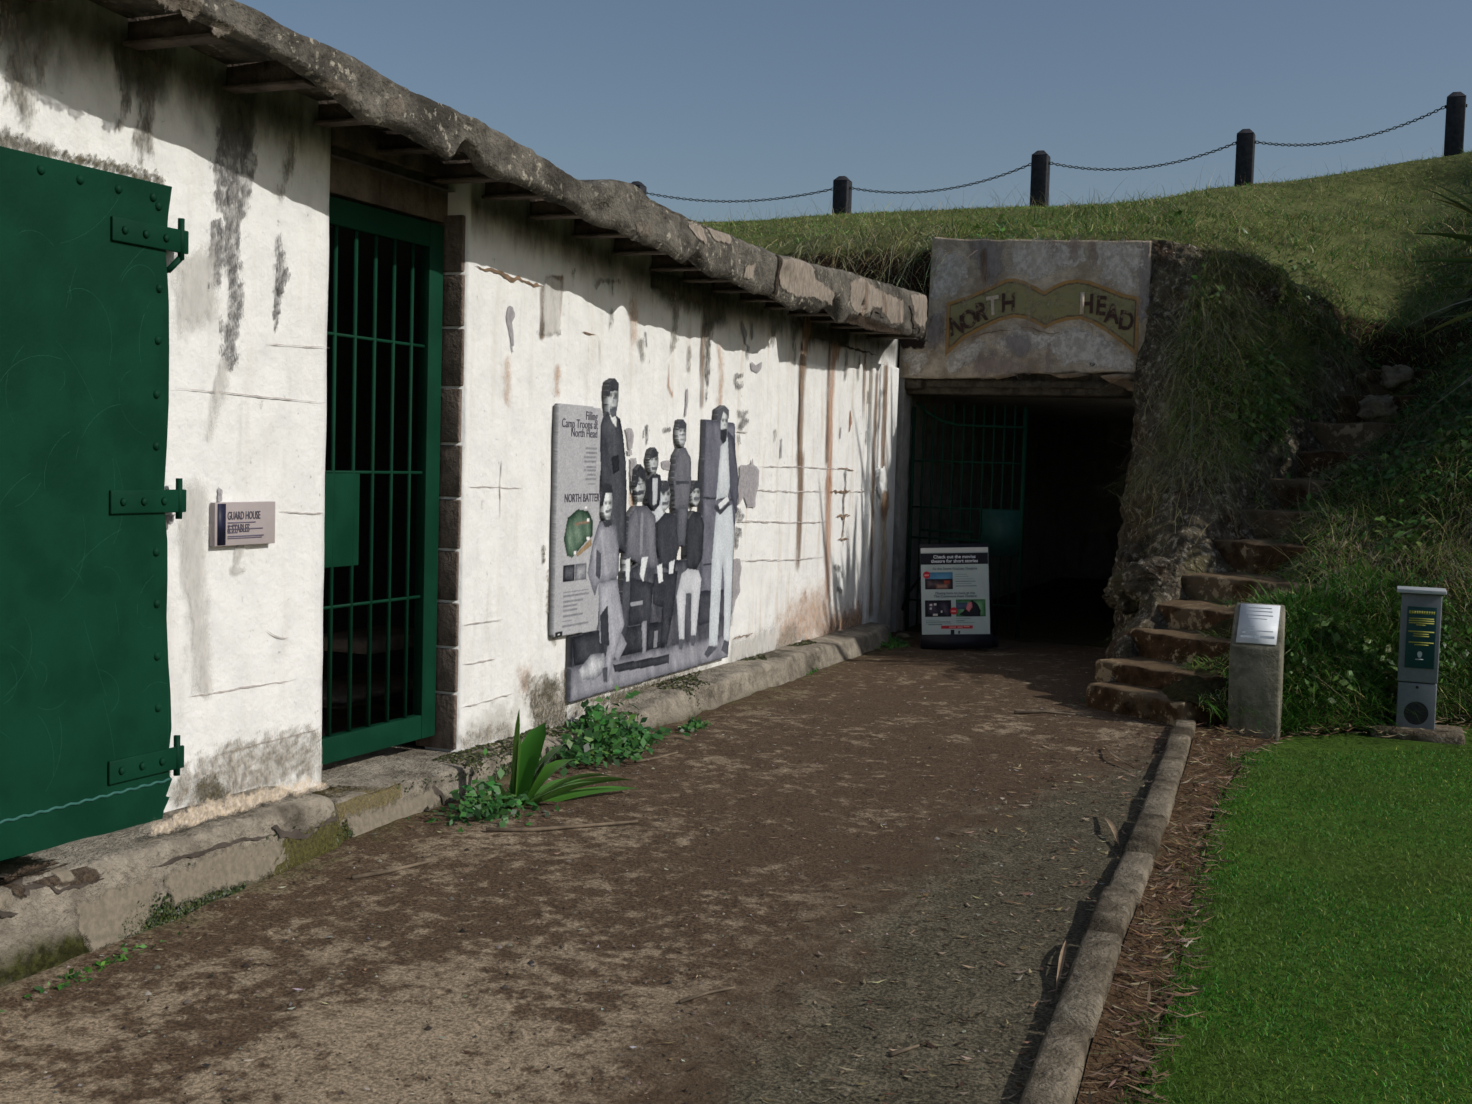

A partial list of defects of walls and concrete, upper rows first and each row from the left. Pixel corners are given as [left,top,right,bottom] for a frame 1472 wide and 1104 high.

leakage [0,0,332,166]
crack [478,266,544,288]
corrosion [825,328,849,598]